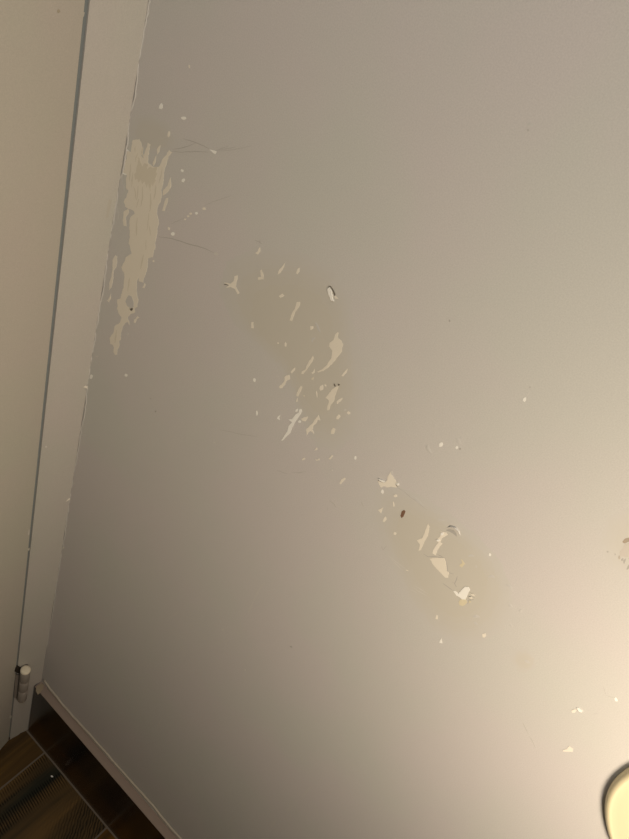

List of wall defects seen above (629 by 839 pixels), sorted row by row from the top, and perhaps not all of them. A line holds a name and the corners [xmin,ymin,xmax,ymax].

peeling [107,139,175,355]
peeling [279,332,343,388]
peeling [277,386,320,441]
peeling [417,525,449,578]
peeling [453,587,475,606]